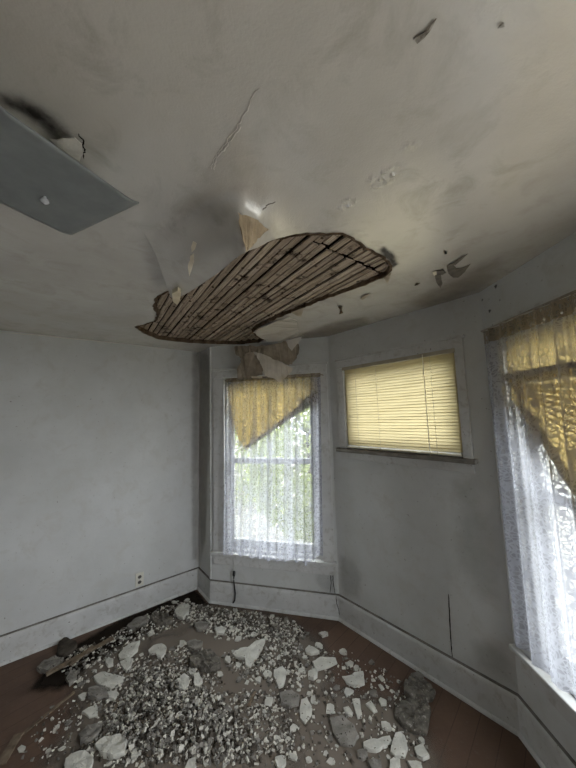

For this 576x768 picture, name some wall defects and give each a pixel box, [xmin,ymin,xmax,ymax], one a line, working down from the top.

spalling [414,19,436,44]
spalling [135,233,392,345]
peeling [432,254,470,288]
crack [446,594,454,657]